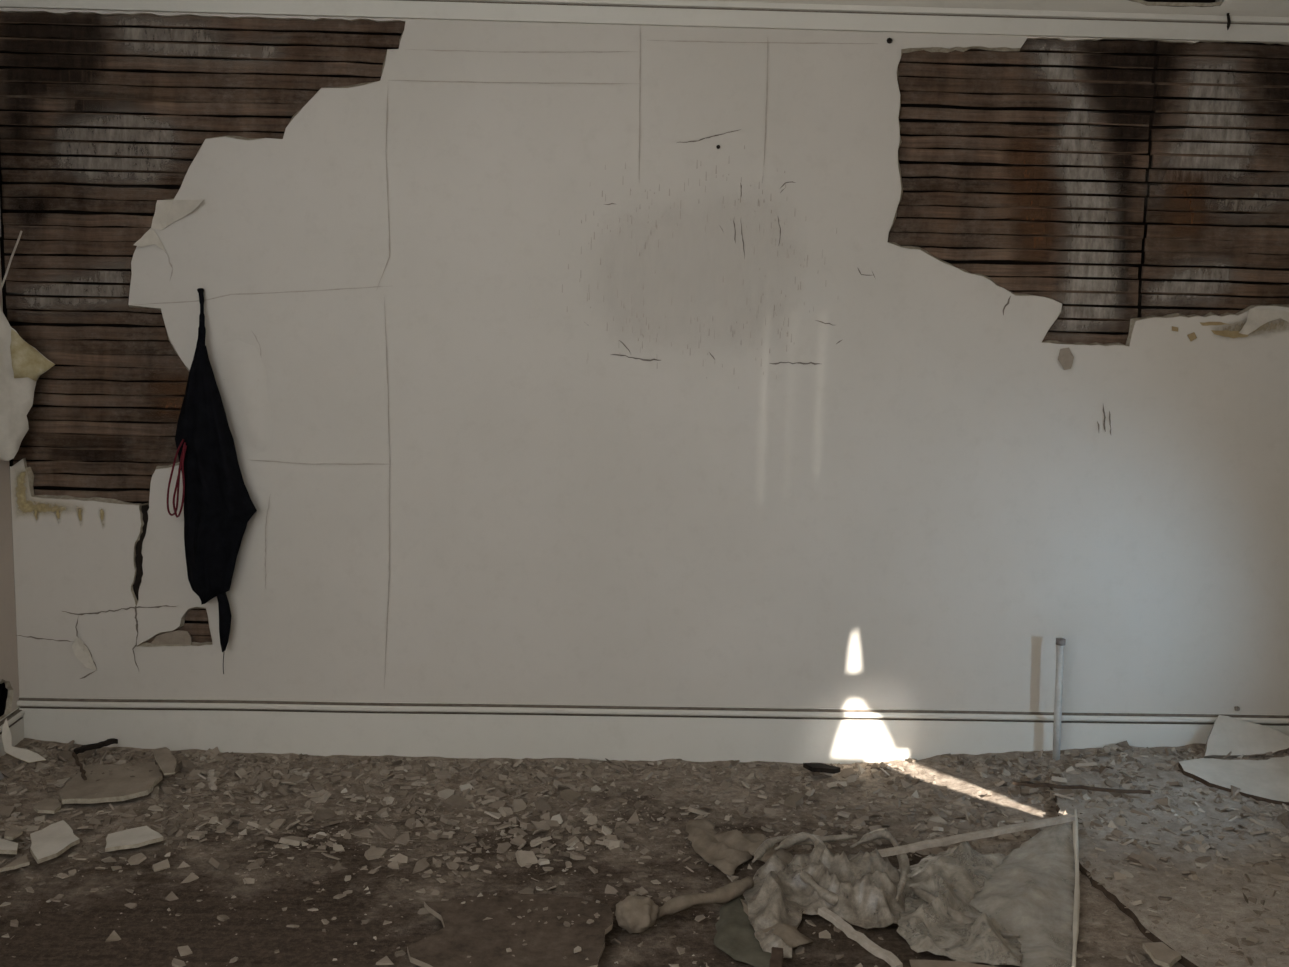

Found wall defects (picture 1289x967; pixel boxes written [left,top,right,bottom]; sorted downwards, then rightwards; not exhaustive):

flaking render [0,12,405,506]
flaking render [887,39,1289,370]
crack [17,503,176,679]
flaking render [136,607,212,647]